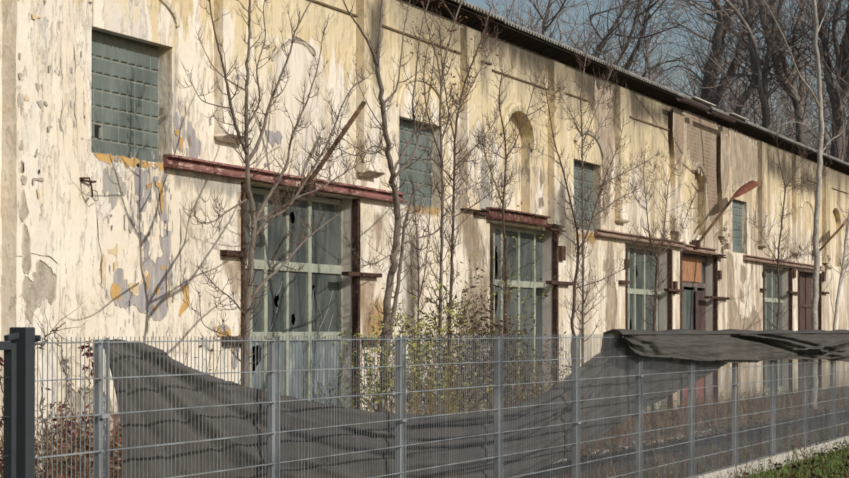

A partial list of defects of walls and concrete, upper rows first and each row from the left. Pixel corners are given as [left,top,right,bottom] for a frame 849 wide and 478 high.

spalling [17,83,48,116]
peeling [170,92,201,159]
spalling [19,160,57,324]
peeling [94,150,190,340]